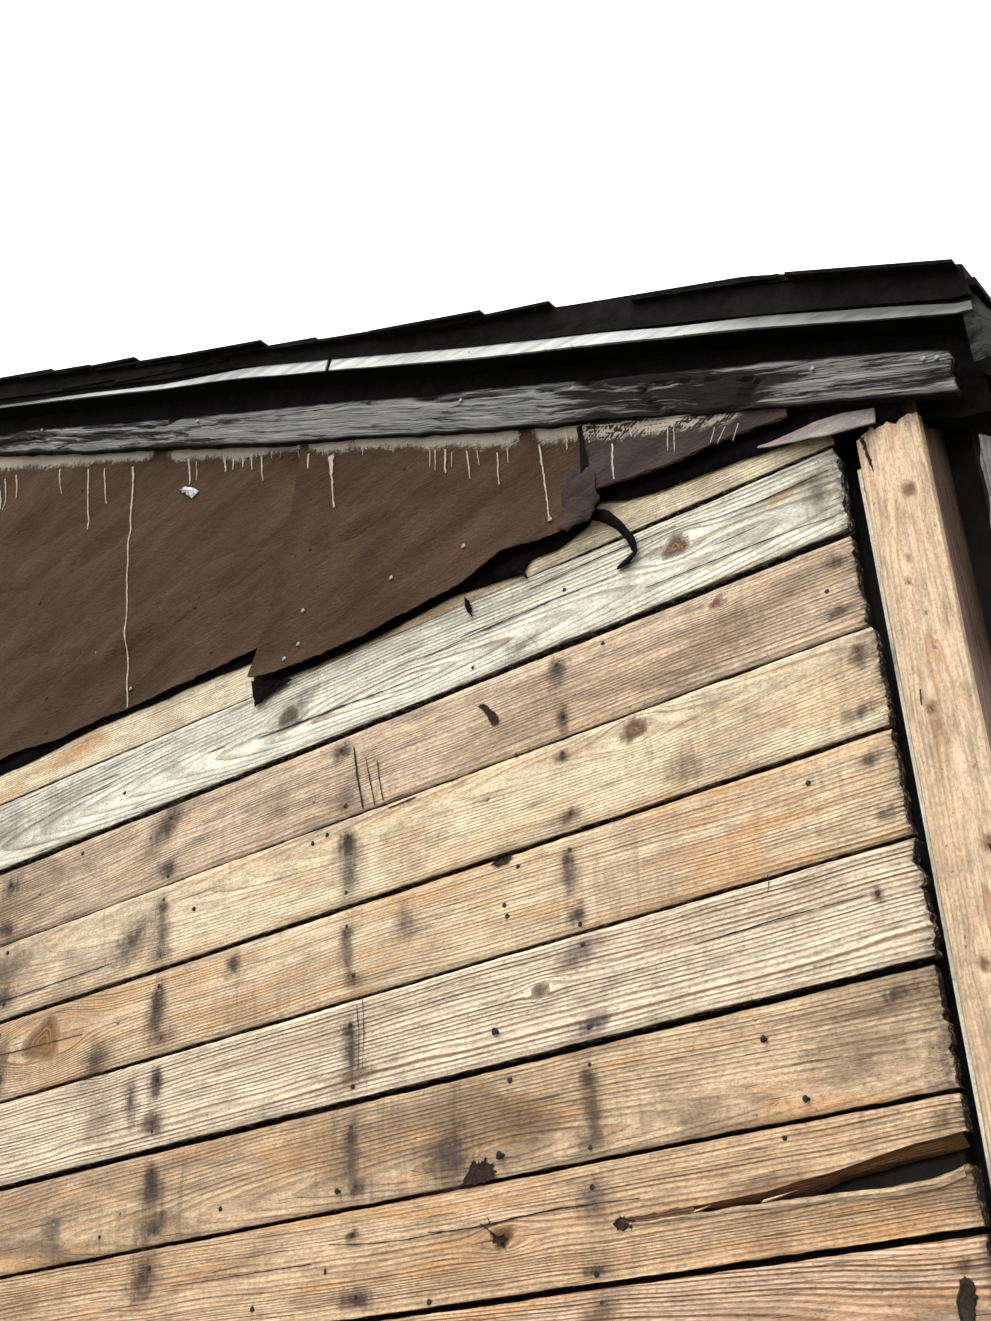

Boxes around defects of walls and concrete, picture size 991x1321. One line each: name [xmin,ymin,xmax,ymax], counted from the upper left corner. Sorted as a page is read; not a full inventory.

damp [429,439,479,479]
spalling [478,704,498,726]
damp [119,924,142,955]